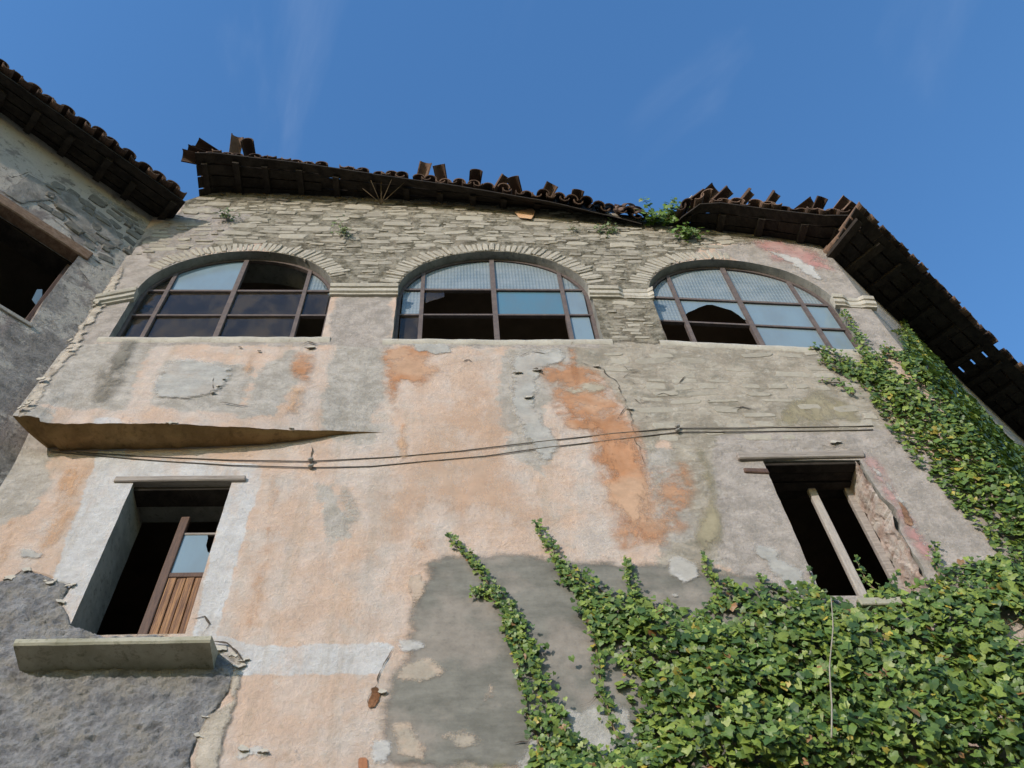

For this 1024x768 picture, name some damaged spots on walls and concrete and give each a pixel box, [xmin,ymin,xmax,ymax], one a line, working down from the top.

flaking render [771,251,822,280]
flaking render [511,348,568,459]
crack [570,342,688,466]
flaking render [872,466,915,527]
flaking render [0,548,250,768]
flaking render [358,545,810,768]